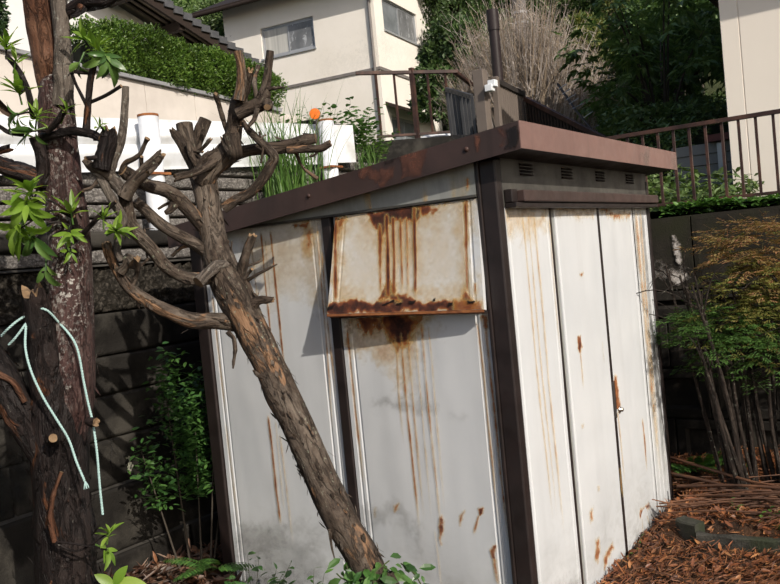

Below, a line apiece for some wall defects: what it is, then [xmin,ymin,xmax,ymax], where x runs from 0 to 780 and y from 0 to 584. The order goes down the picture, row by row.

rust [255,233,284,359]
rust [293,200,505,508]
rust [268,418,287,518]
rust [595,540,613,568]